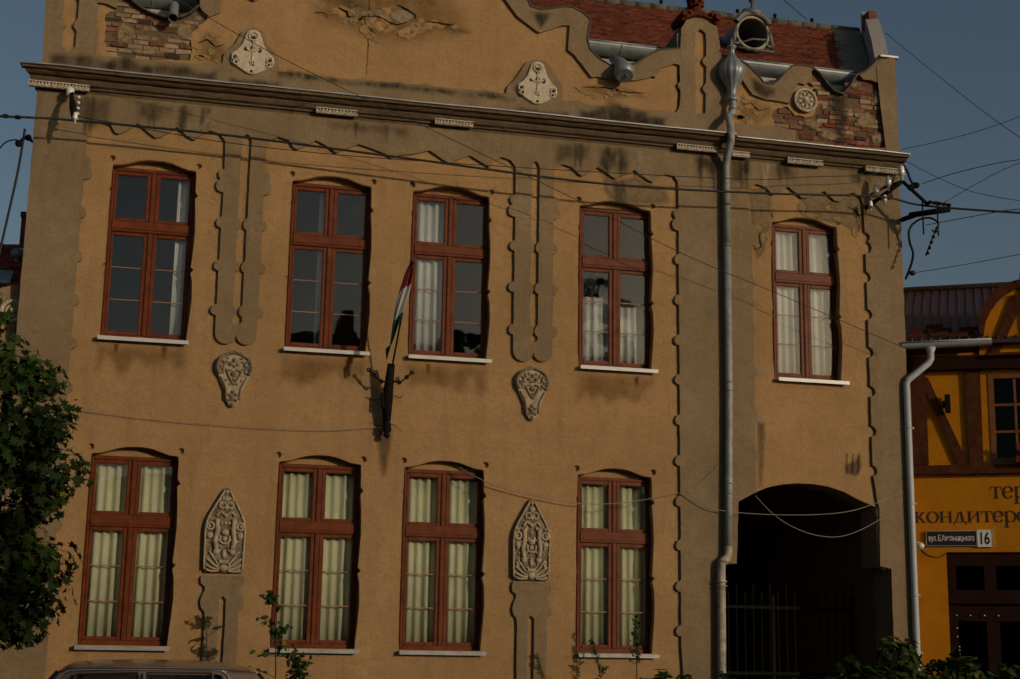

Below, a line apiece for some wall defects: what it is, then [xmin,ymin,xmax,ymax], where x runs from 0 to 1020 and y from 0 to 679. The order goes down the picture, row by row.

flaking render [105,2,224,63]
flaking render [734,77,885,148]
leakage [602,150,667,202]
peeling [797,196,861,238]